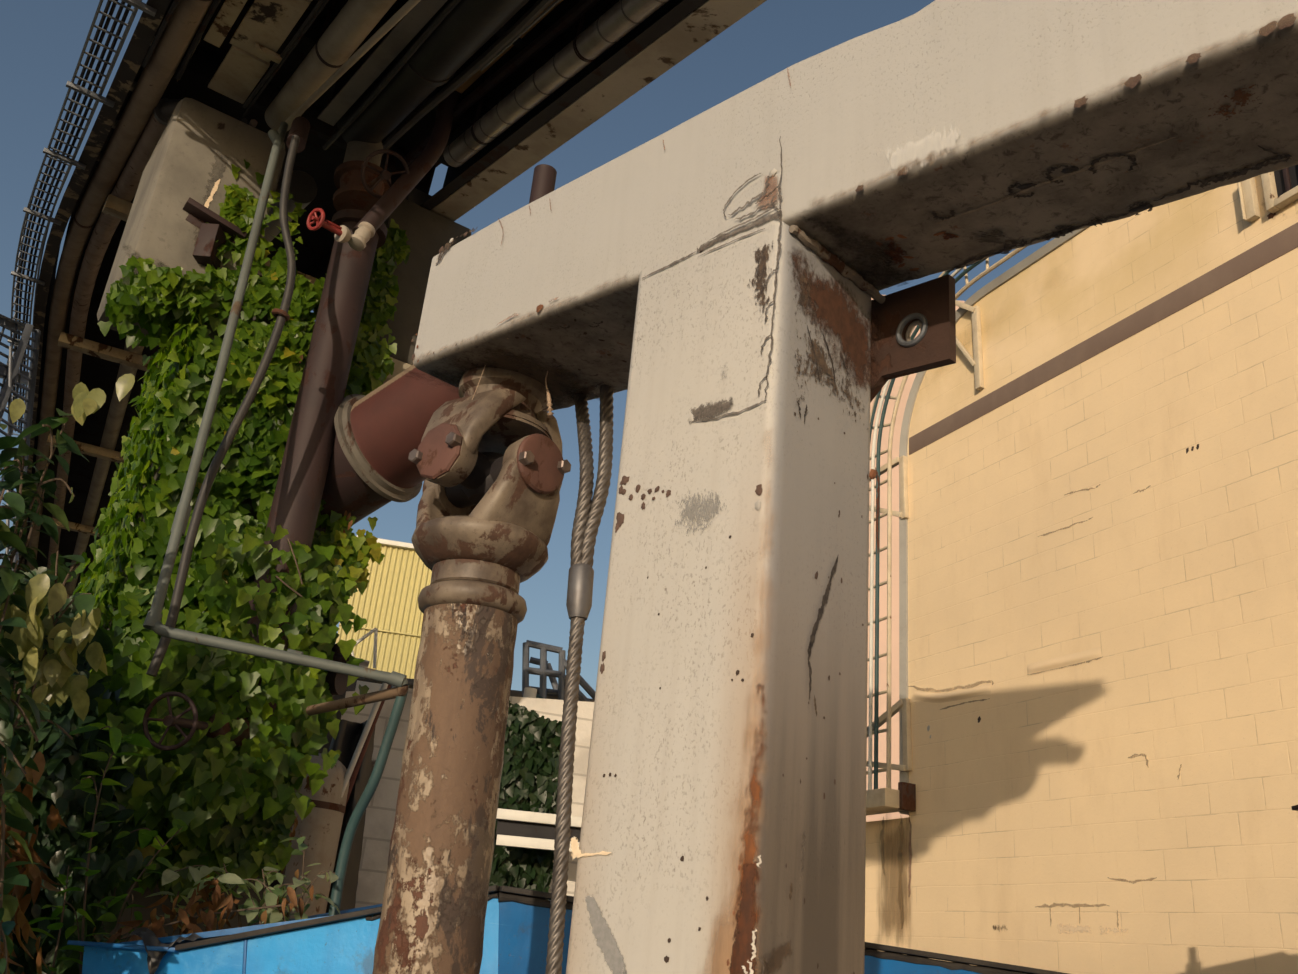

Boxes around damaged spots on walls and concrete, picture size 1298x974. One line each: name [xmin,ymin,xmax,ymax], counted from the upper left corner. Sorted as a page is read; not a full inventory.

crack [946,145,1292,272]
crack [643,136,783,399]
crack [1041,484,1100,536]
crack [908,680,994,710]
crack [1030,657,1101,675]
corrosion [698,731,763,974]
water stain [881,815,912,931]
crack [1037,877,1157,935]